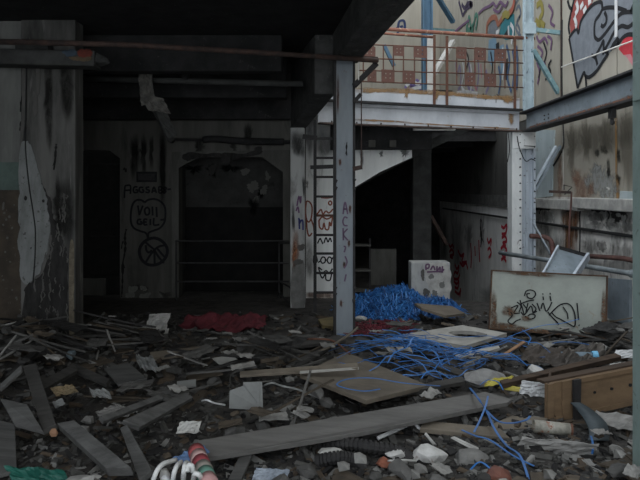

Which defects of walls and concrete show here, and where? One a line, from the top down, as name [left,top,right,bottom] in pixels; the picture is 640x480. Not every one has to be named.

leakage [44,69,52,142]
rust [362,88,513,103]
peeling [2,68,75,340]
leakage [131,138,166,197]
leakage [582,123,632,198]